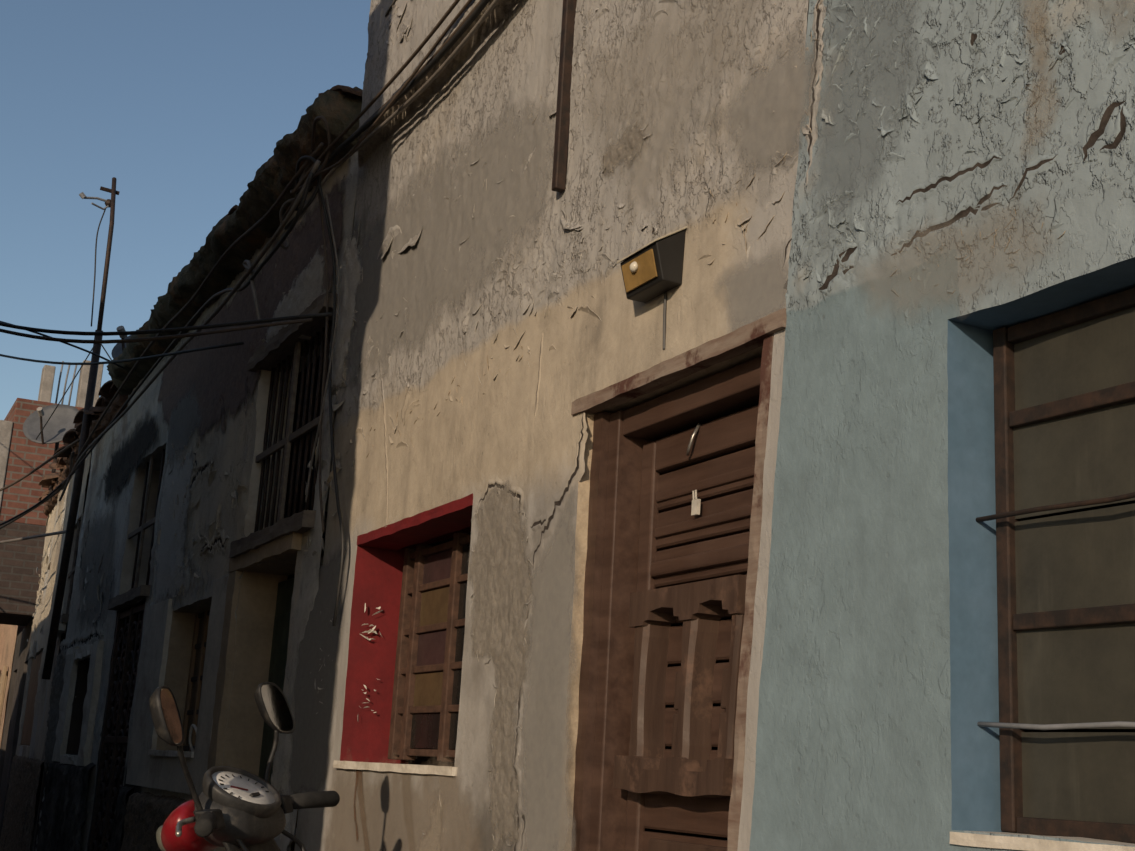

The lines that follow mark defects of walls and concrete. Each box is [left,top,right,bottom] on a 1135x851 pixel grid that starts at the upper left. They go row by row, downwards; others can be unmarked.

peeling [371,0,413,50]
flaking render [602,120,652,175]
crack [804,0,827,186]
peeling [794,0,941,162]
crack [891,95,1135,258]
peeling [975,0,1062,123]
peeling [377,225,423,259]
peeling [484,204,648,322]
crack [779,237,792,329]
crack [818,235,858,297]
spalling [55,361,77,406]
flaking render [43,645,67,774]